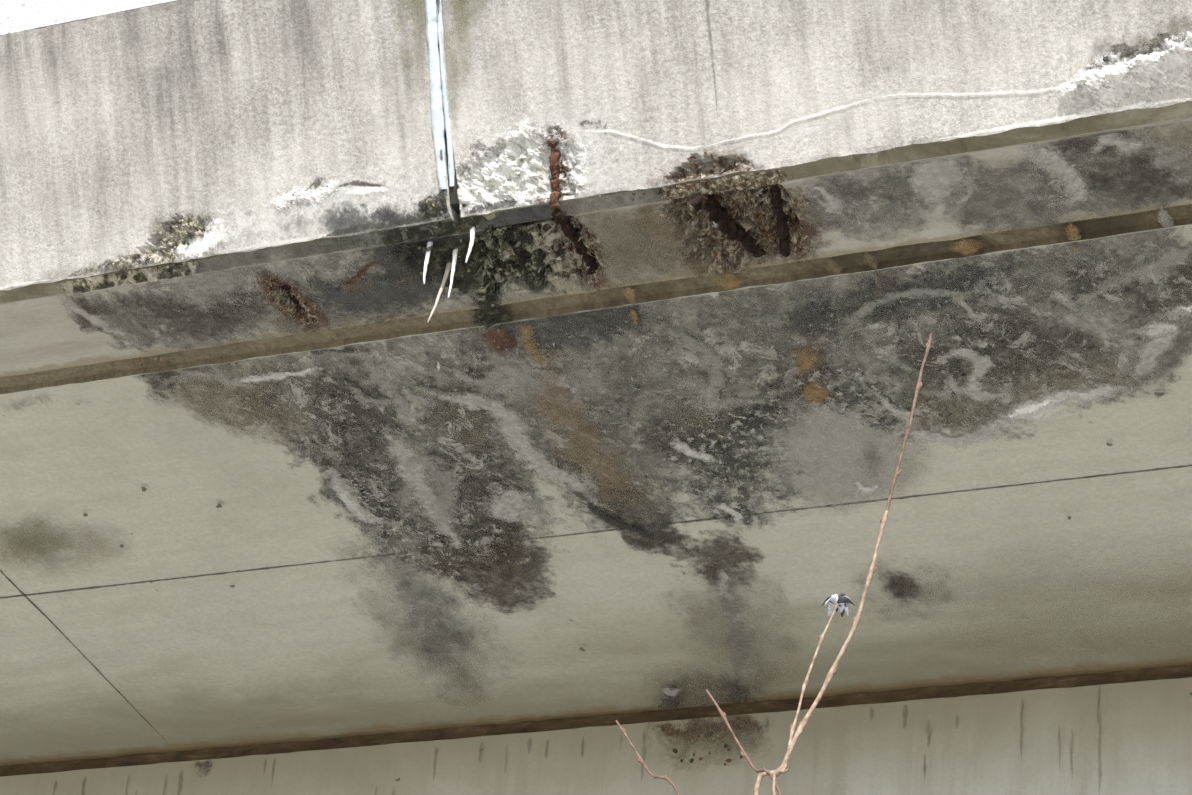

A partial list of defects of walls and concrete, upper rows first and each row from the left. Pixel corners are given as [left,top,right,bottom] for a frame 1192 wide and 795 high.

crack [572,85,1072,149]
water stain [940,98,1192,139]
spalling [60,215,252,294]
water stain [61,167,482,351]
rust [257,271,328,330]
spalling [456,107,821,326]
water stain [802,131,1192,240]
water stain [138,226,1192,709]